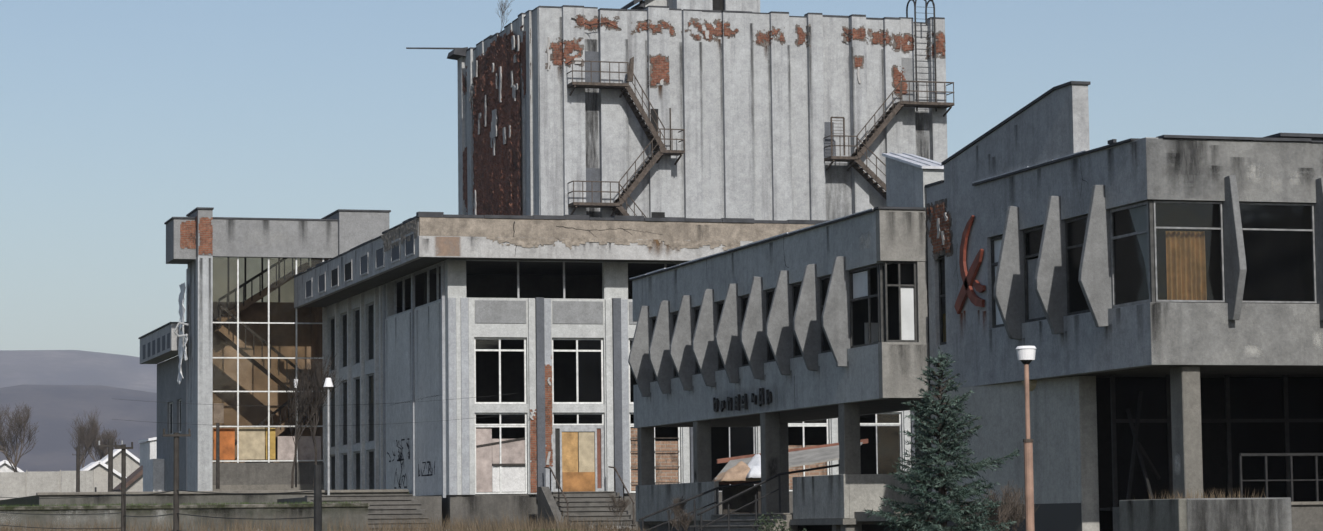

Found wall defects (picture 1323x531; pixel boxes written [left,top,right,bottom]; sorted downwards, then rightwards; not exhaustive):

spalling [752,24,811,48]
spalling [841,25,946,96]
spalling [462,14,739,215]
spalling [180,216,213,255]
spalling [926,198,953,260]